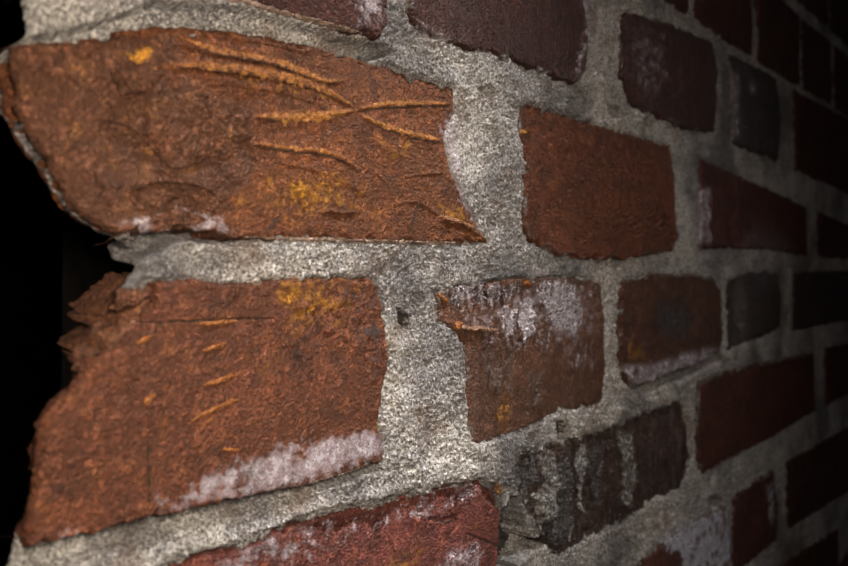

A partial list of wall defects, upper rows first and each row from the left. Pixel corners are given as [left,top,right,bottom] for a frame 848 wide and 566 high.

spalling [0,32,257,246]
crack [260,147,352,168]
crack [186,45,444,143]
damp [449,280,587,393]
damp [185,431,381,501]